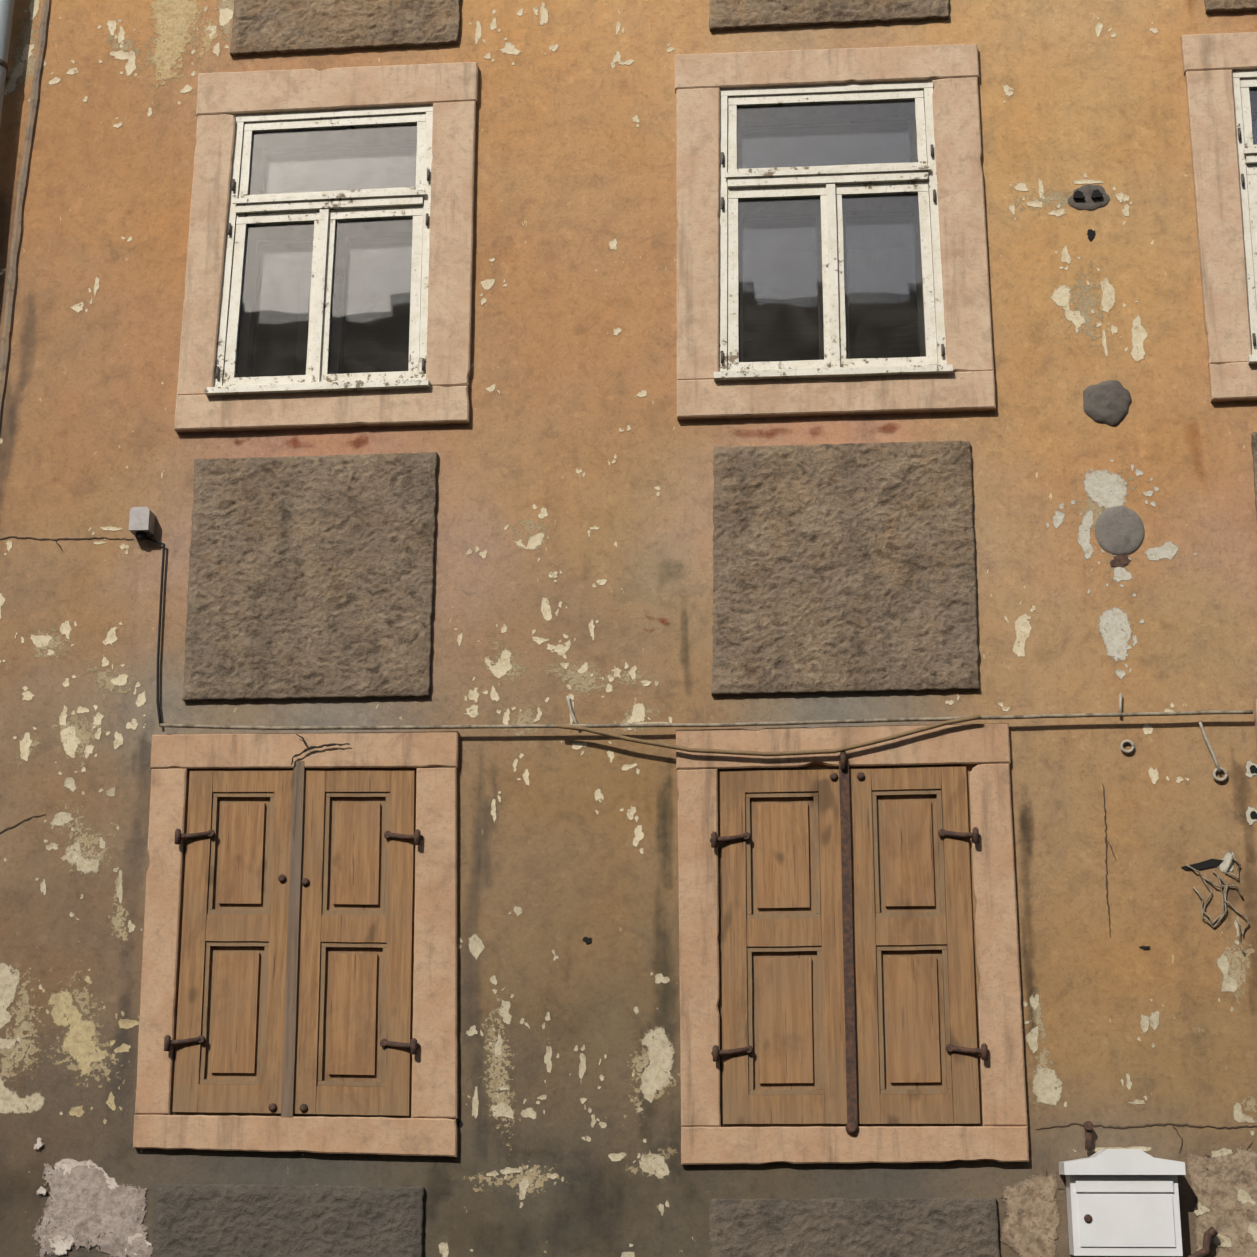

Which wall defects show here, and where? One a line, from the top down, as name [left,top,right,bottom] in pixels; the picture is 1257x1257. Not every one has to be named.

peeling [1051,245,1148,361]
peeling [1046,451,1179,597]
peeling [13,621,146,946]
crack [291,734,350,766]
peeling [464,598,672,786]
crack [1102,783,1116,937]
peeling [0,957,139,1124]
flaking render [32,1158,153,1257]
peeling [463,975,569,1208]
peeling [608,1139,678,1180]
peeling [623,1026,681,1126]
flaking render [1186,1095,1257,1257]